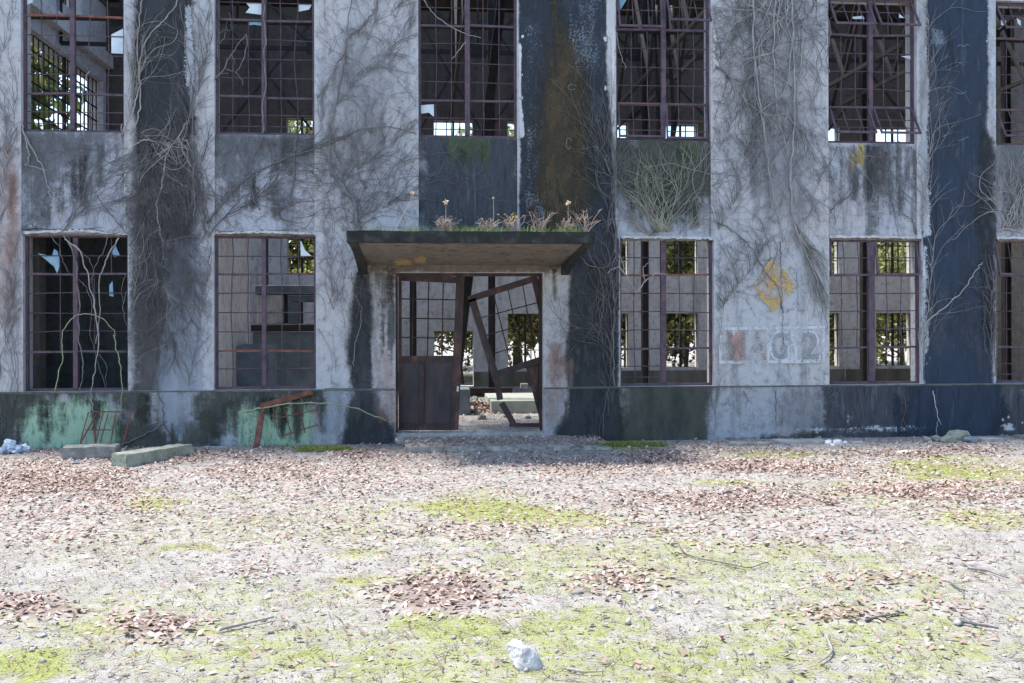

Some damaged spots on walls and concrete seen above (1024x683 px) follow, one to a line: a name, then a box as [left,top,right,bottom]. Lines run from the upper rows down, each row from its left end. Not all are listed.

water stain [419,0,713,441]
water stain [797,0,1024,438]
water stain [16,401,64,442]
water stain [222,398,307,446]
water stain [319,271,396,445]